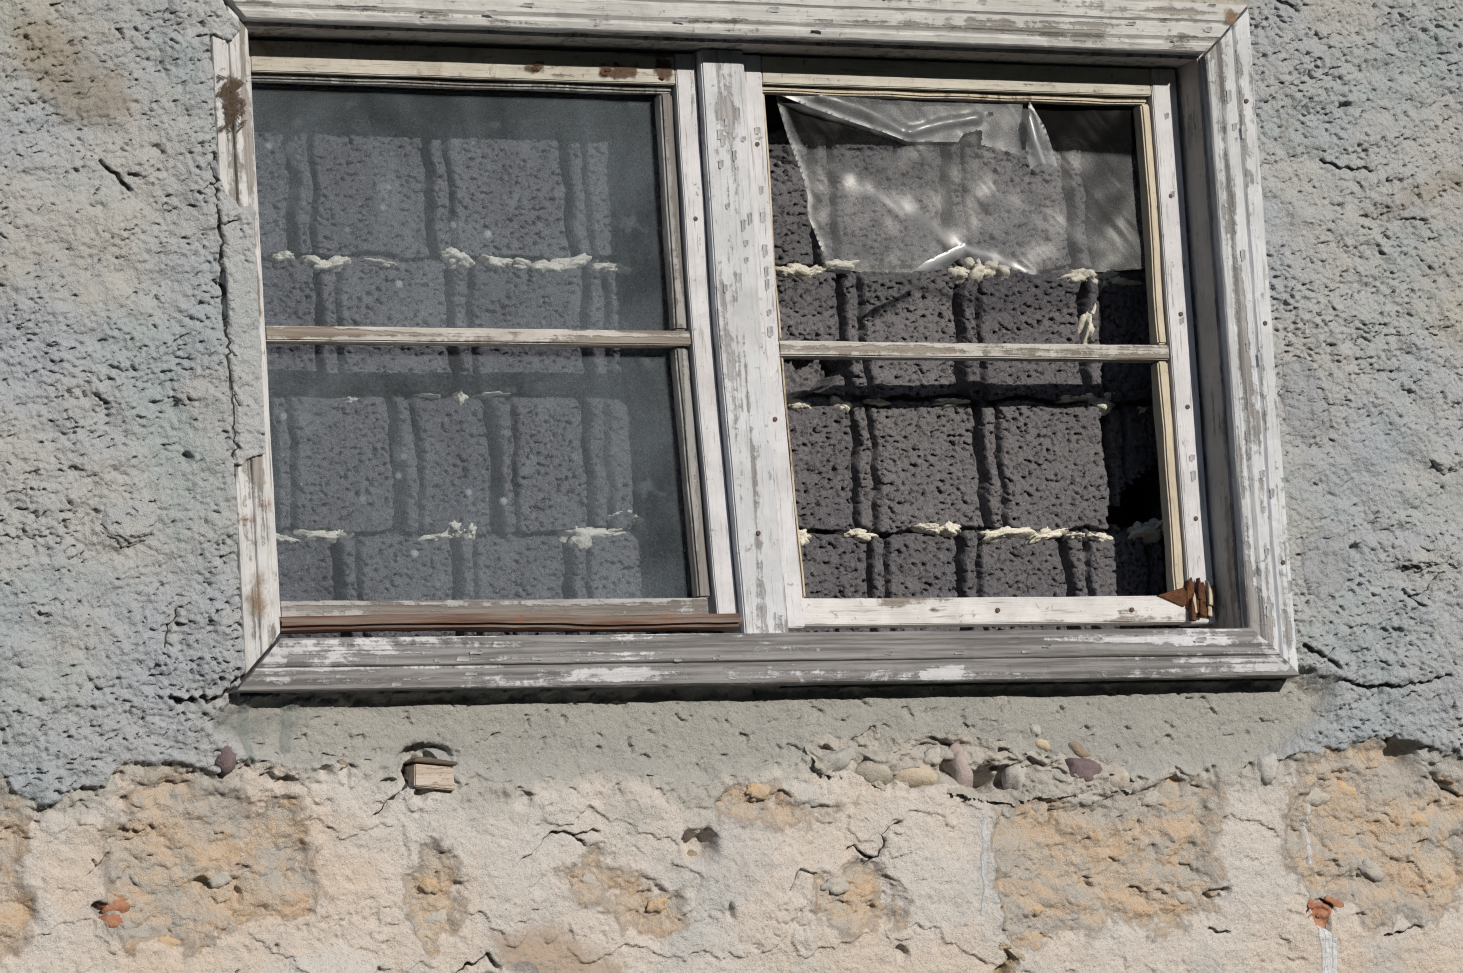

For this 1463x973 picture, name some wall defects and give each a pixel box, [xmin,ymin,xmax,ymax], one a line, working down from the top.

crack [210,153,240,459]
spalling [0,794,37,959]
spalling [90,770,334,957]
crack [374,757,412,815]
spalling [402,840,467,955]
crack [519,829,596,862]
spalling [554,842,688,938]
spalling [715,778,845,831]
crack [846,822,900,865]
spalling [804,725,1225,973]
spalling [1281,737,1463,933]
crack [456,953,493,973]